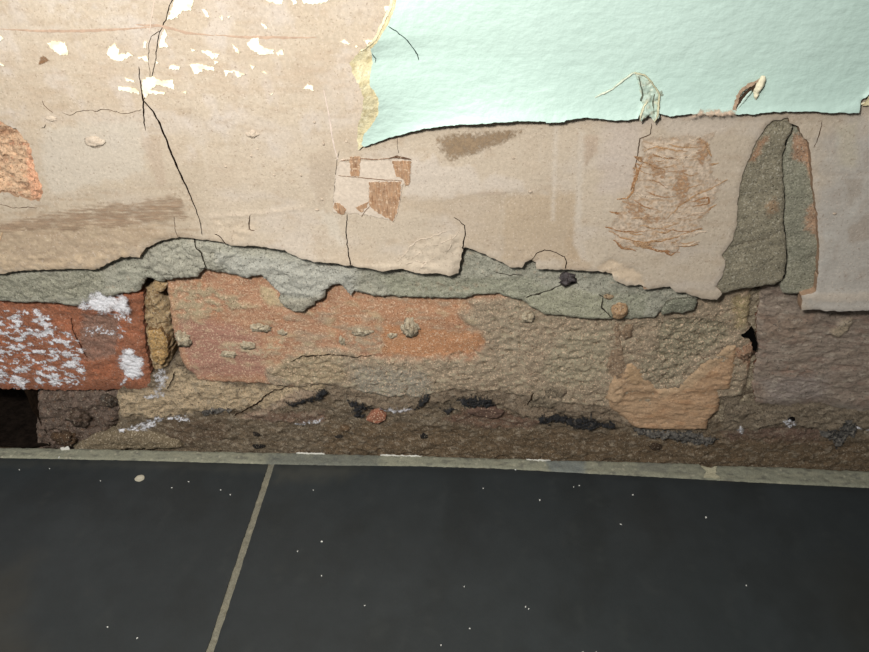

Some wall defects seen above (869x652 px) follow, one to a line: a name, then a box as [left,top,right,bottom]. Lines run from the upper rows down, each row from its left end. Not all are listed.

peeling [159,0,231,48]
peeling [118,48,267,98]
flaking render [0,121,43,199]
crack [42,0,226,269]
peeling [333,160,411,222]
flaking render [716,118,817,294]
flaking render [0,237,698,319]
leakage [0,309,86,389]
leakage [79,292,132,338]
leakage [118,348,144,385]
spalling [741,326,757,351]
spalling [0,388,52,448]